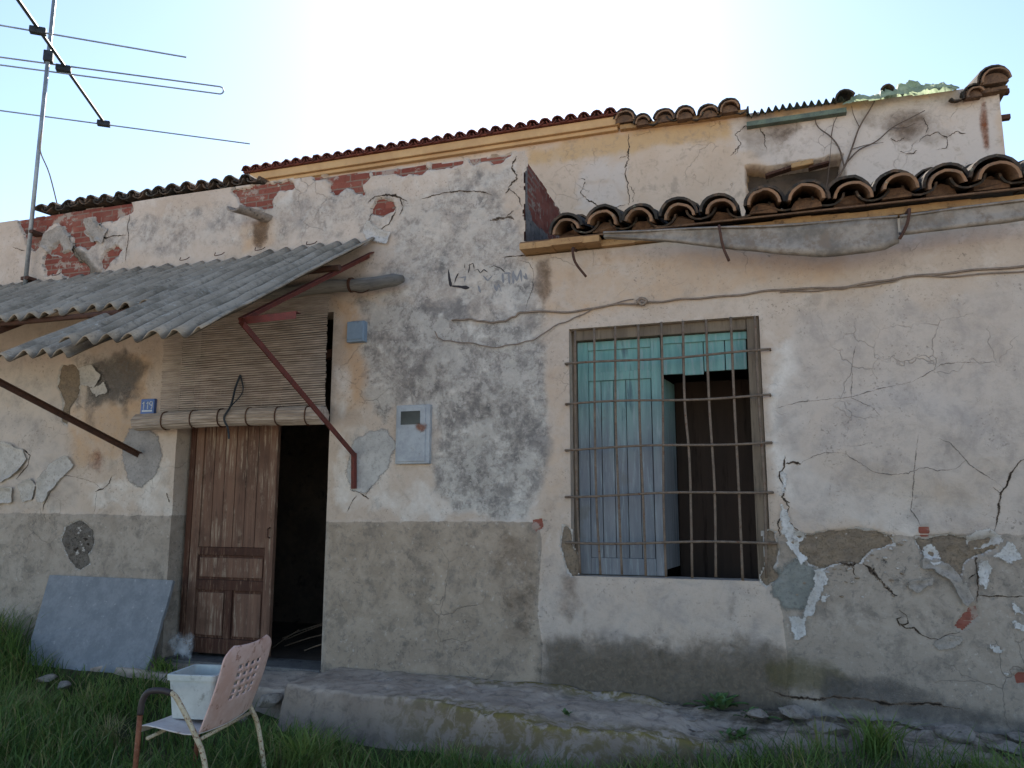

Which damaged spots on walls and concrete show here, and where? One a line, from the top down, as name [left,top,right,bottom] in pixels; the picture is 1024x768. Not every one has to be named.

spalling [313,155,511,244]
crack [369,156,520,229]
crack [580,135,635,207]
crack [891,118,965,154]
spalling [17,204,133,279]
water stain [92,350,144,405]
crack [779,349,992,411]
flaking render [122,428,162,488]
flaking render [345,429,396,493]
crack [777,434,1024,536]
spalling [759,471,1022,640]
water stain [540,641,790,711]